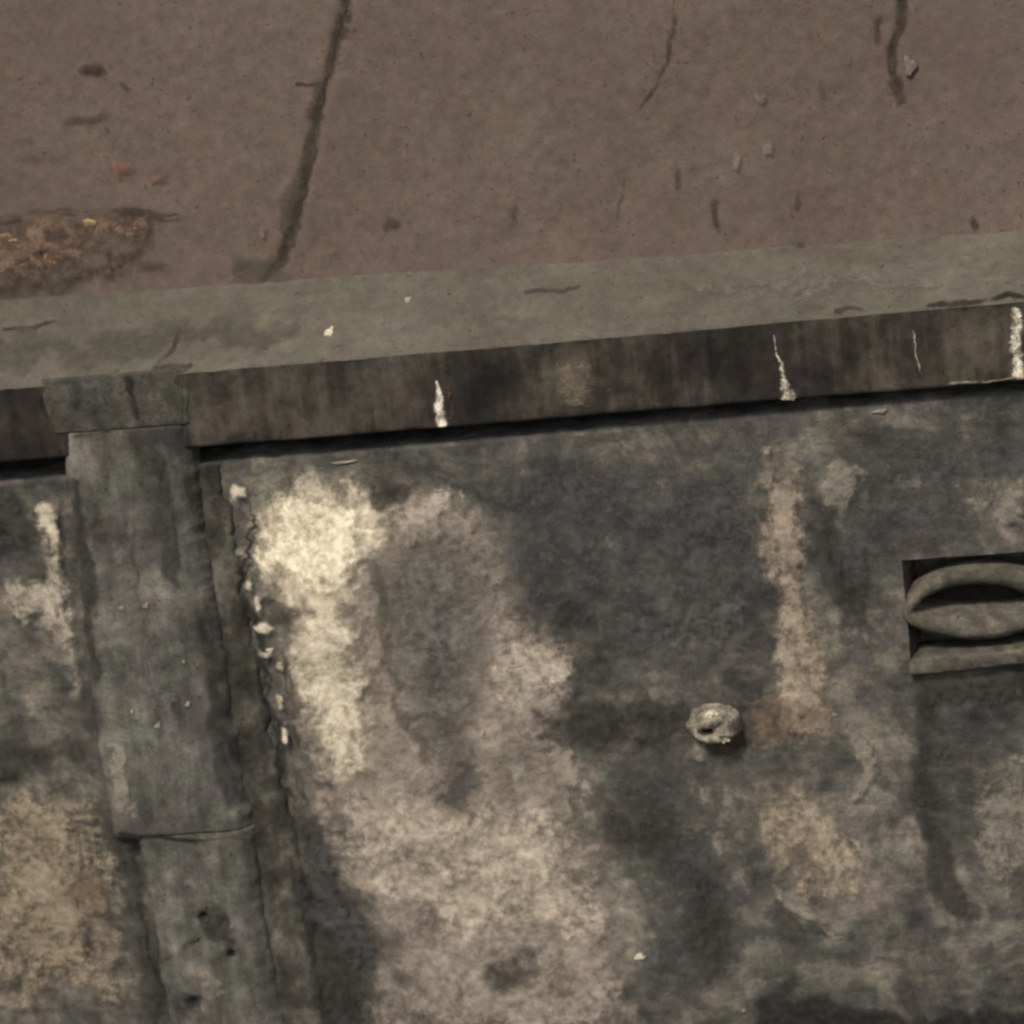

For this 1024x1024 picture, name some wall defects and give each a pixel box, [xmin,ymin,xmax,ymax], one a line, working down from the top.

crack [640,18,675,107]
crack [873,0,918,104]
crack [274,0,351,269]
efflorescence [435,381,446,427]
efflorescence [774,337,794,400]
efflorescence [950,307,1024,384]
leakage [0,477,101,778]
leakage [290,439,1024,1024]